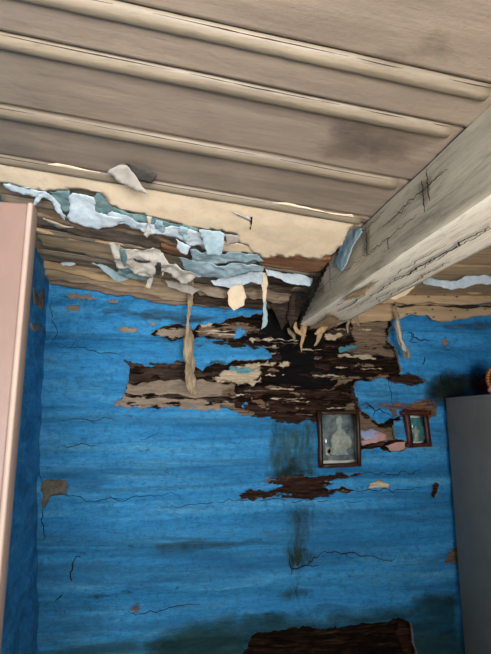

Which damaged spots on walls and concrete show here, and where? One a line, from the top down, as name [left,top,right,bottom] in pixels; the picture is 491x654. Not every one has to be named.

peeling [0,163,354,260]
crack [316,169,448,292]
peeling [32,281,45,310]
spalling [114,308,430,452]
water stain [272,426,311,480]
spalling [41,479,68,507]
crack [54,492,327,508]
spalling [238,472,360,501]
crack [288,551,394,573]
spalling [242,617,415,654]